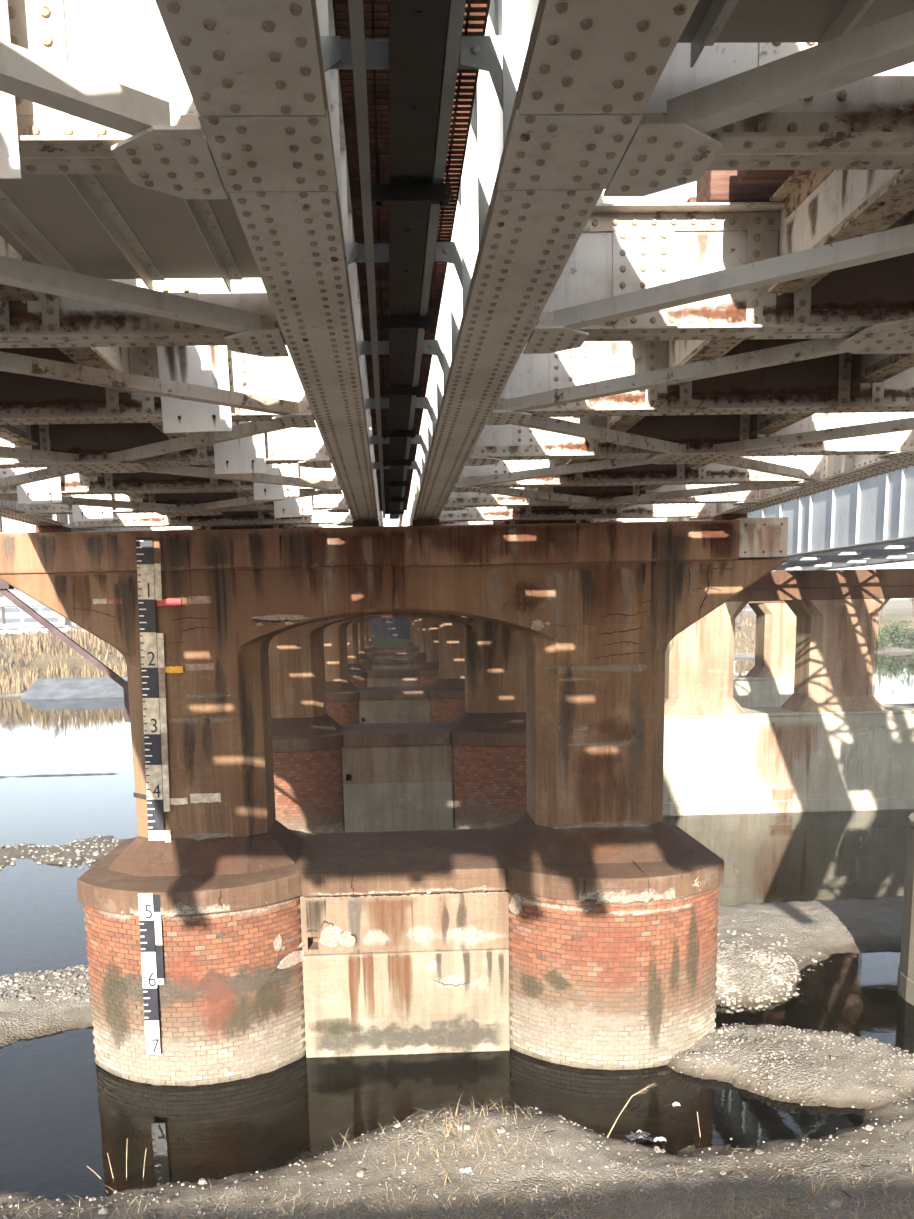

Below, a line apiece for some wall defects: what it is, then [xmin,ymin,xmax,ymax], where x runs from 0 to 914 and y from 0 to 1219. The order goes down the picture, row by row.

rust [850,100,914,128]
rust [589,387,914,421]
rust [50,463,404,595]
rust [419,468,745,560]
rust [687,523,780,578]
rust [764,724,817,773]
spalling [509,894,521,915]
spalling [269,920,357,976]
rust [363,957,373,1007]
rust [388,956,411,1002]
leakage [306,883,695,1067]
leakage [104,957,290,1083]